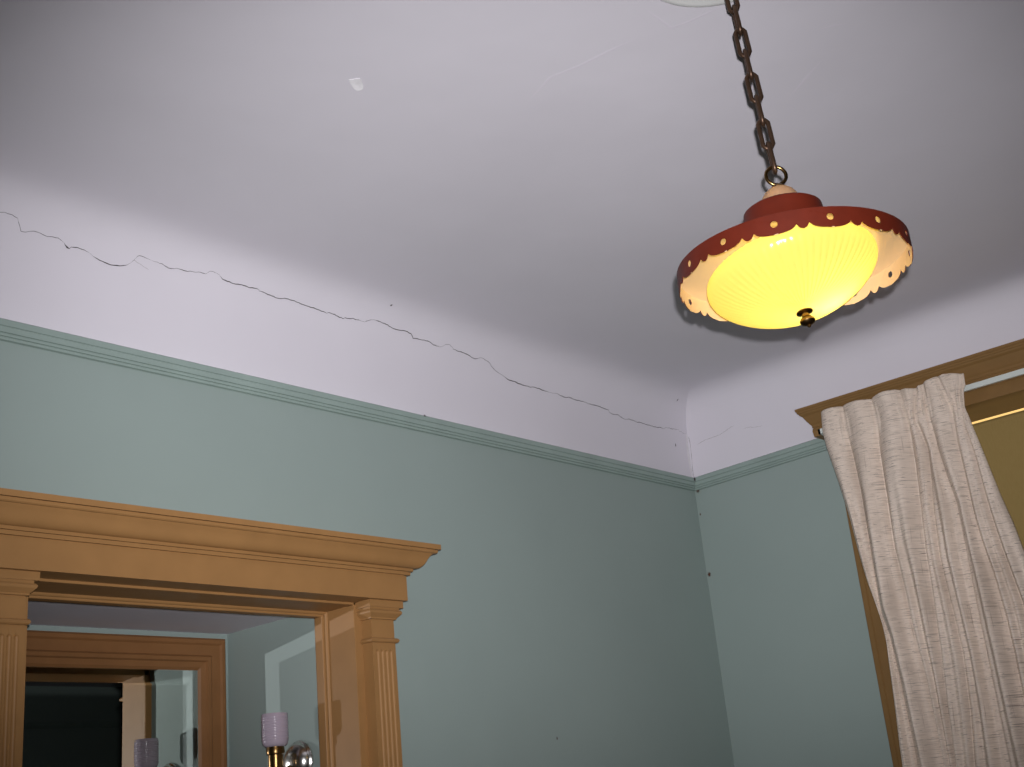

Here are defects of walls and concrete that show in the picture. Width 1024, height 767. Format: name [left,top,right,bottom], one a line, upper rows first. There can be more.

crack [5,212,759,477]